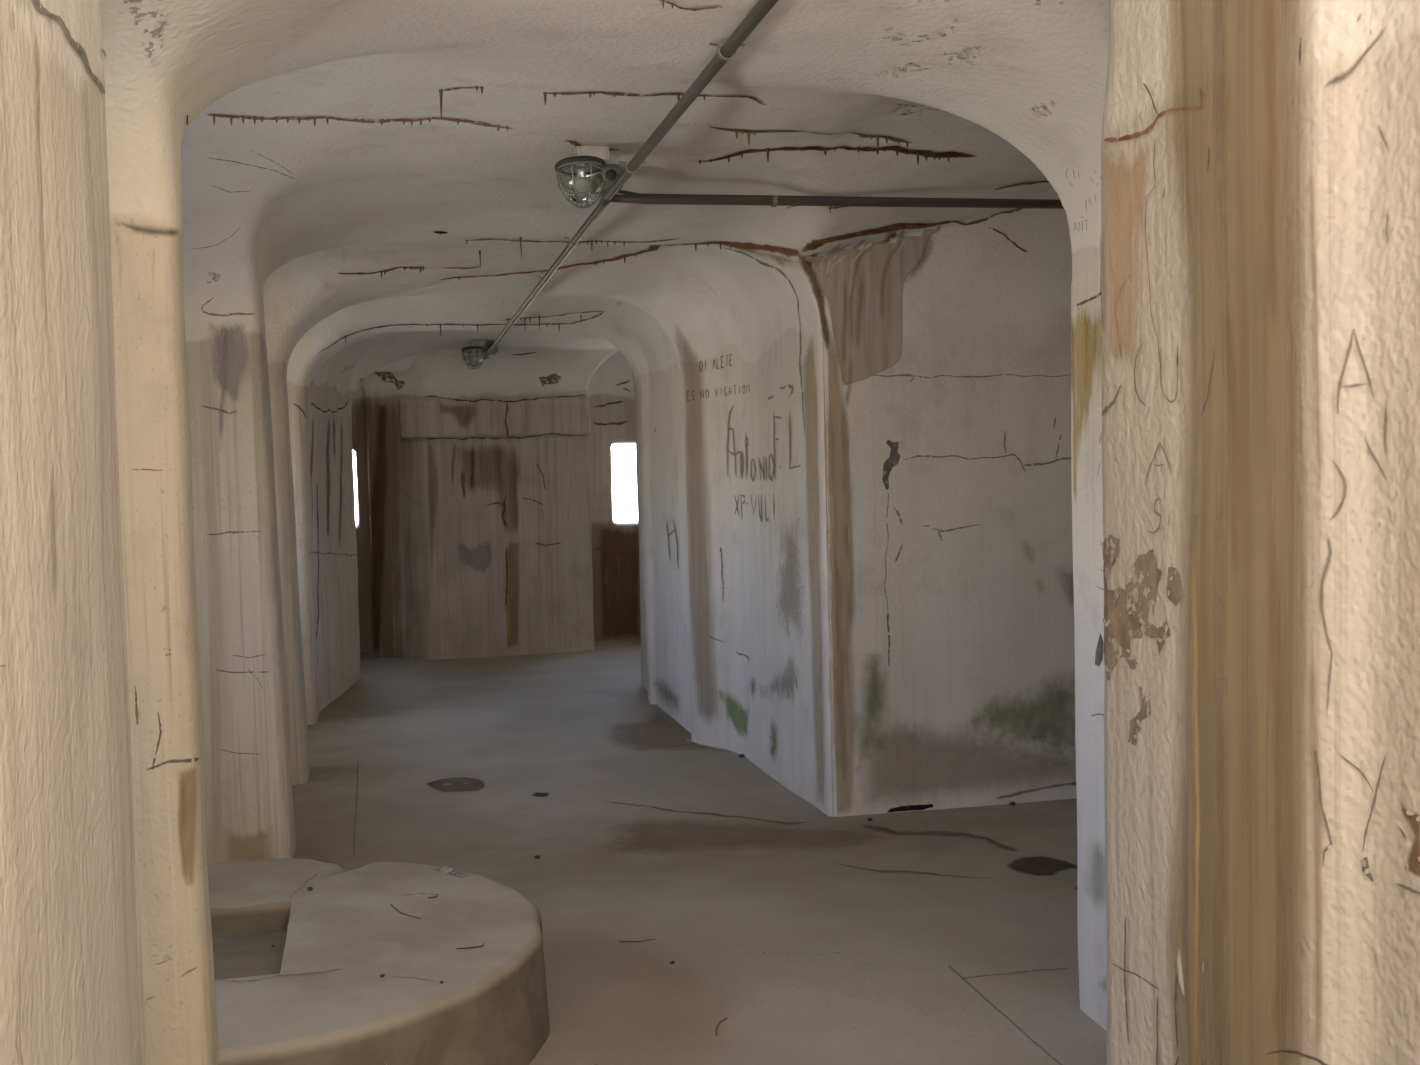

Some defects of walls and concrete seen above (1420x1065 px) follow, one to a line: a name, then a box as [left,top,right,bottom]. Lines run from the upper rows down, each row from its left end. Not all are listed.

crack [34,0,106,94]
peeling [129,0,165,65]
crack [543,92,976,164]
crack [829,181,1050,252]
leakage [216,328,244,433]
crack [322,237,805,431]
crack [425,380,631,526]
peeling [1095,535,1183,680]
peeling [1128,687,1150,745]
crack [1315,750,1406,862]
crack [1395,883,1420,894]
crack [1267,1050,1328,1065]